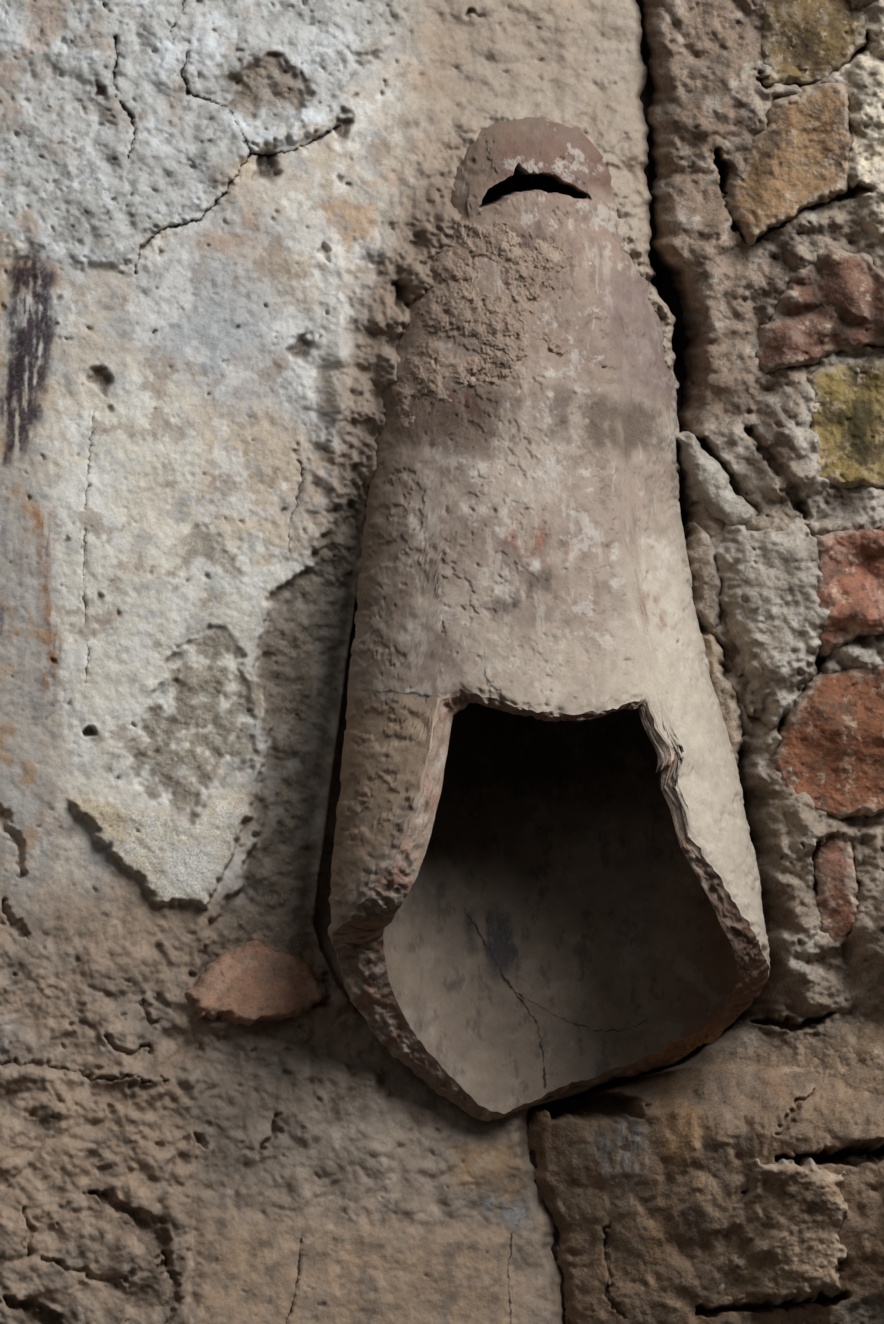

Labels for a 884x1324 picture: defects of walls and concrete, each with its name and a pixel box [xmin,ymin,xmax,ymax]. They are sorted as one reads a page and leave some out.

crack [113,36,135,158]
crack [134,0,340,274]
crack [635,0,688,432]
crack [714,161,725,188]
water stain [1,254,55,462]
crack [742,789,754,845]
crack [783,1147,884,1160]
spalling [7,1296,63,1324]
spalling [89,1188,185,1324]
crack [450,1125,570,1324]
crack [604,1226,624,1318]
crack [700,1295,824,1314]